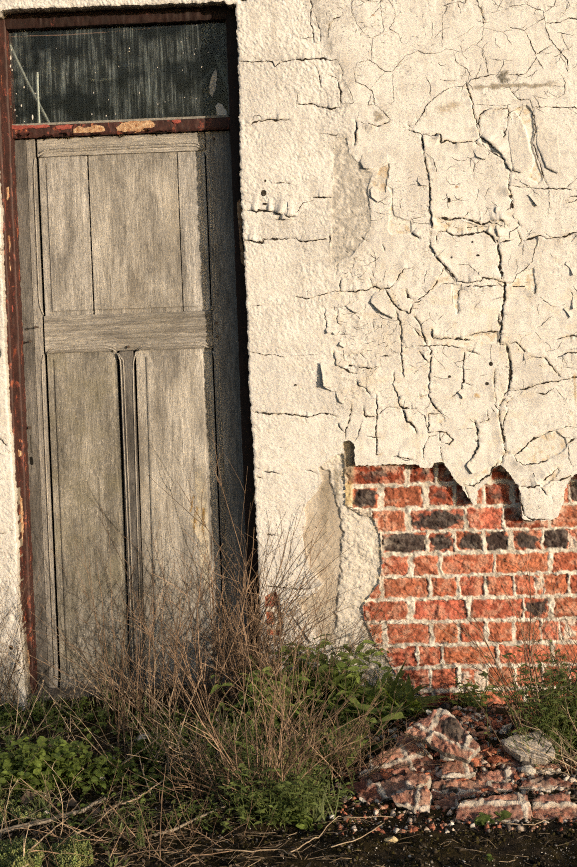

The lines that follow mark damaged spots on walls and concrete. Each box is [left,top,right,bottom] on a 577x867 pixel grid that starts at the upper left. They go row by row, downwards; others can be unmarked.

flaking render [259,440,577,708]